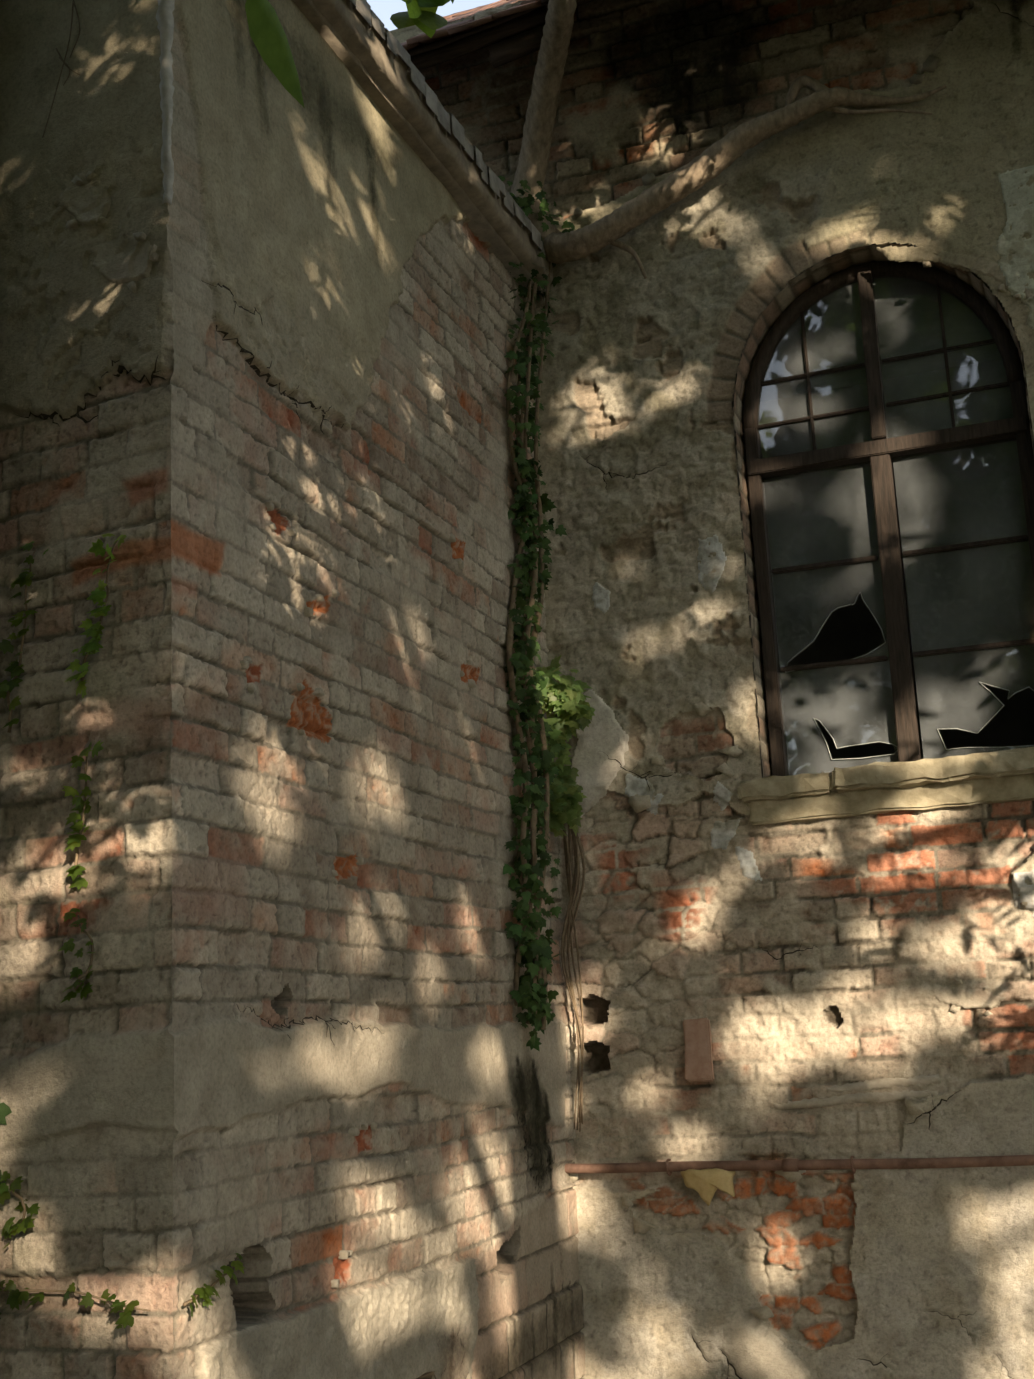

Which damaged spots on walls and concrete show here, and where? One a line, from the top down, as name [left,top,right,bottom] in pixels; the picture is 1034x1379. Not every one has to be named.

leakage [605,3,778,129]
spalling [264,502,297,537]
spalling [304,589,340,618]
peeling [592,582,611,614]
spalling [555,689,1034,1352]
crack [691,1334,742,1379]
crack [924,1311,1013,1379]